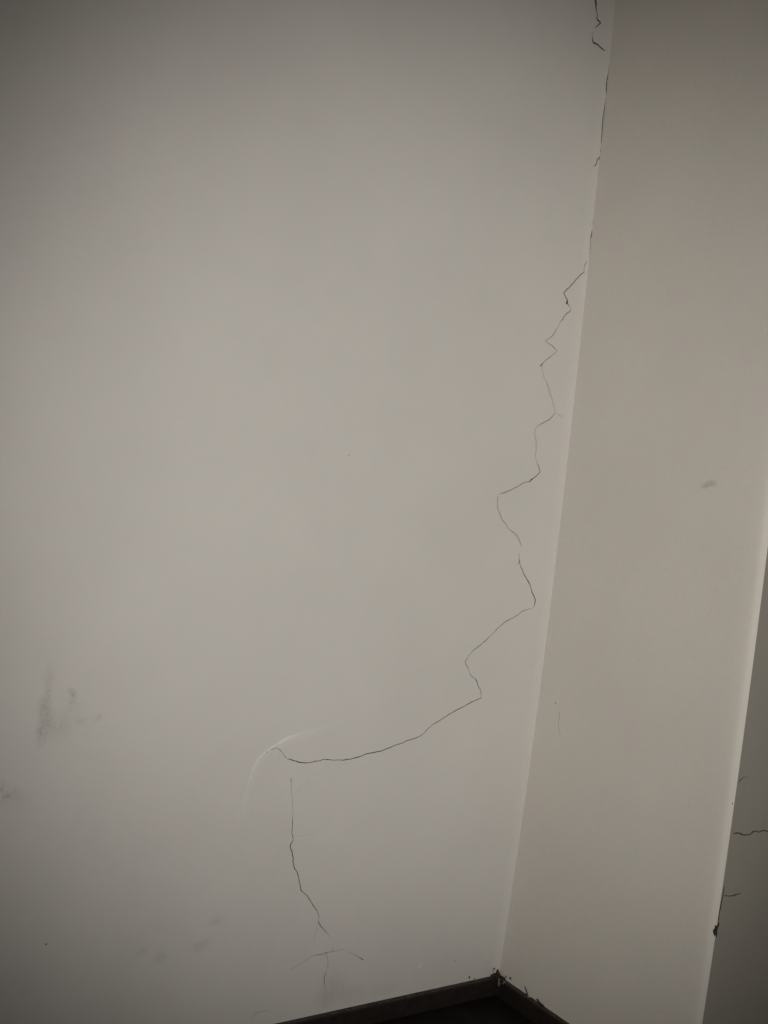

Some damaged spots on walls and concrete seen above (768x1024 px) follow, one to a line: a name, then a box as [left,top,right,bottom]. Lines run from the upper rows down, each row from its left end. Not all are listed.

crack [592,0,609,167]
crack [271,232,592,984]